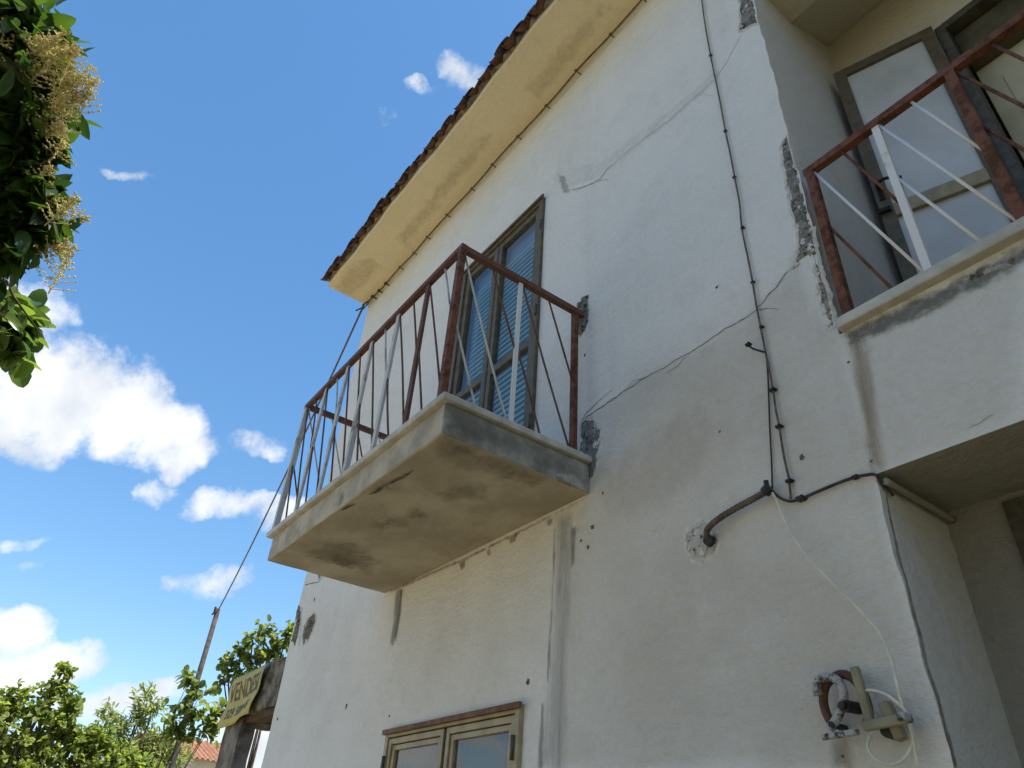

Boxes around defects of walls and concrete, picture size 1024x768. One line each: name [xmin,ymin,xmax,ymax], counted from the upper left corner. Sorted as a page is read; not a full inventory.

flaking render [737,0,758,33]
crack [572,35,741,190]
flaking render [779,135,838,332]
water stain [848,250,1024,342]
crack [581,271,788,421]
flaking render [577,414,604,495]
spalling [683,517,721,564]
flaking render [291,598,317,647]